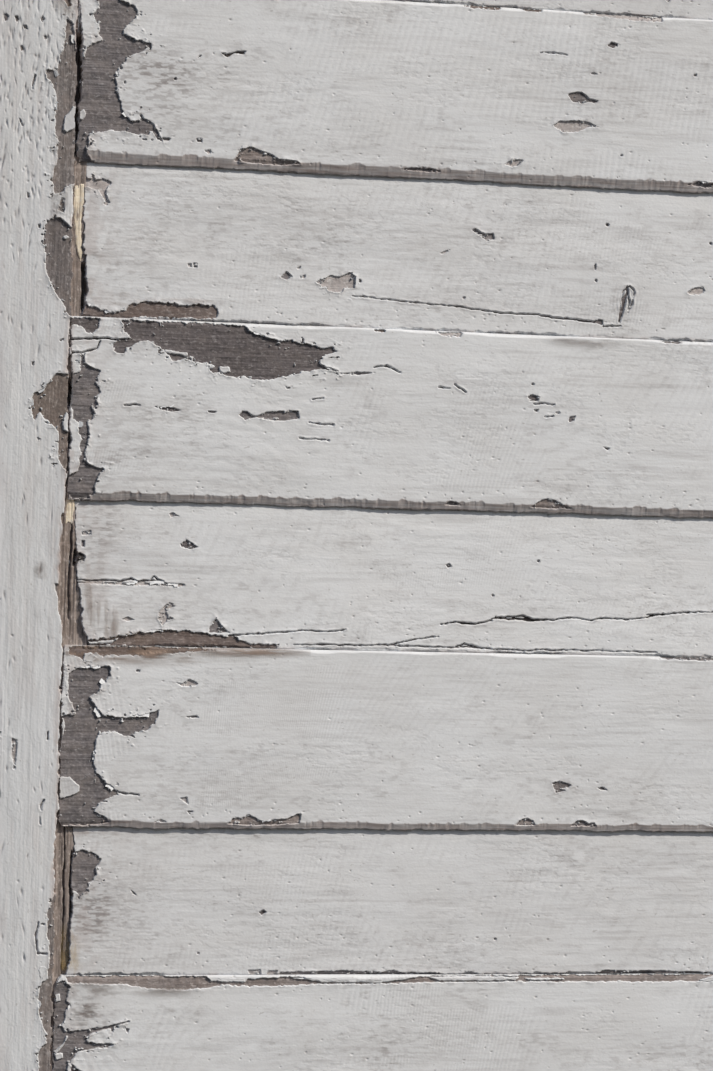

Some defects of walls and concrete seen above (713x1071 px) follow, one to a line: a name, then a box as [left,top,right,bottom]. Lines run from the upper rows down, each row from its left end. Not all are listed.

peeling [554,121,595,132]
peeling [38,0,369,389]
crack [361,286,634,327]
peeling [29,352,105,500]
peeling [240,411,299,421]
crack [228,611,700,653]
peeling [59,603,279,826]
peeling [72,844,104,898]